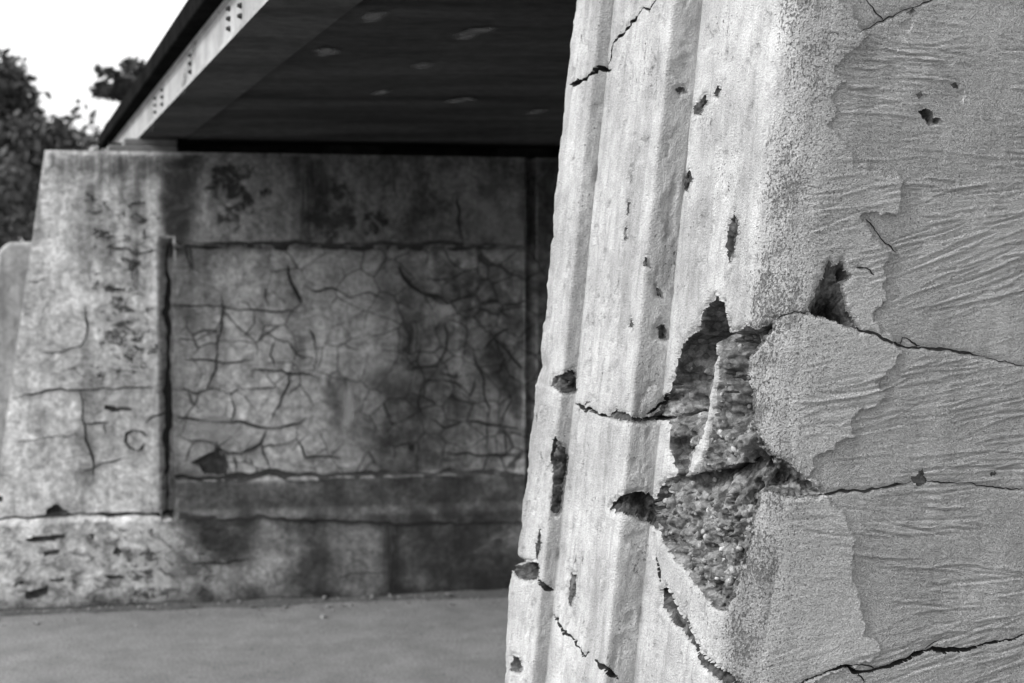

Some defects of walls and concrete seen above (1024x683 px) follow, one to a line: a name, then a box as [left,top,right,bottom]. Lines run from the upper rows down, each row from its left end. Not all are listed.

crack [570,0,656,87]
damp [160,155,270,255]
damp [294,156,388,243]
crack [13,264,385,479]
crack [575,401,607,417]
flaking render [607,0,904,683]
crack [857,327,1022,366]
spalling [550,436,568,515]
damp [77,595,148,608]
damp [298,544,348,598]
damp [376,509,517,597]
crack [801,634,1024,683]